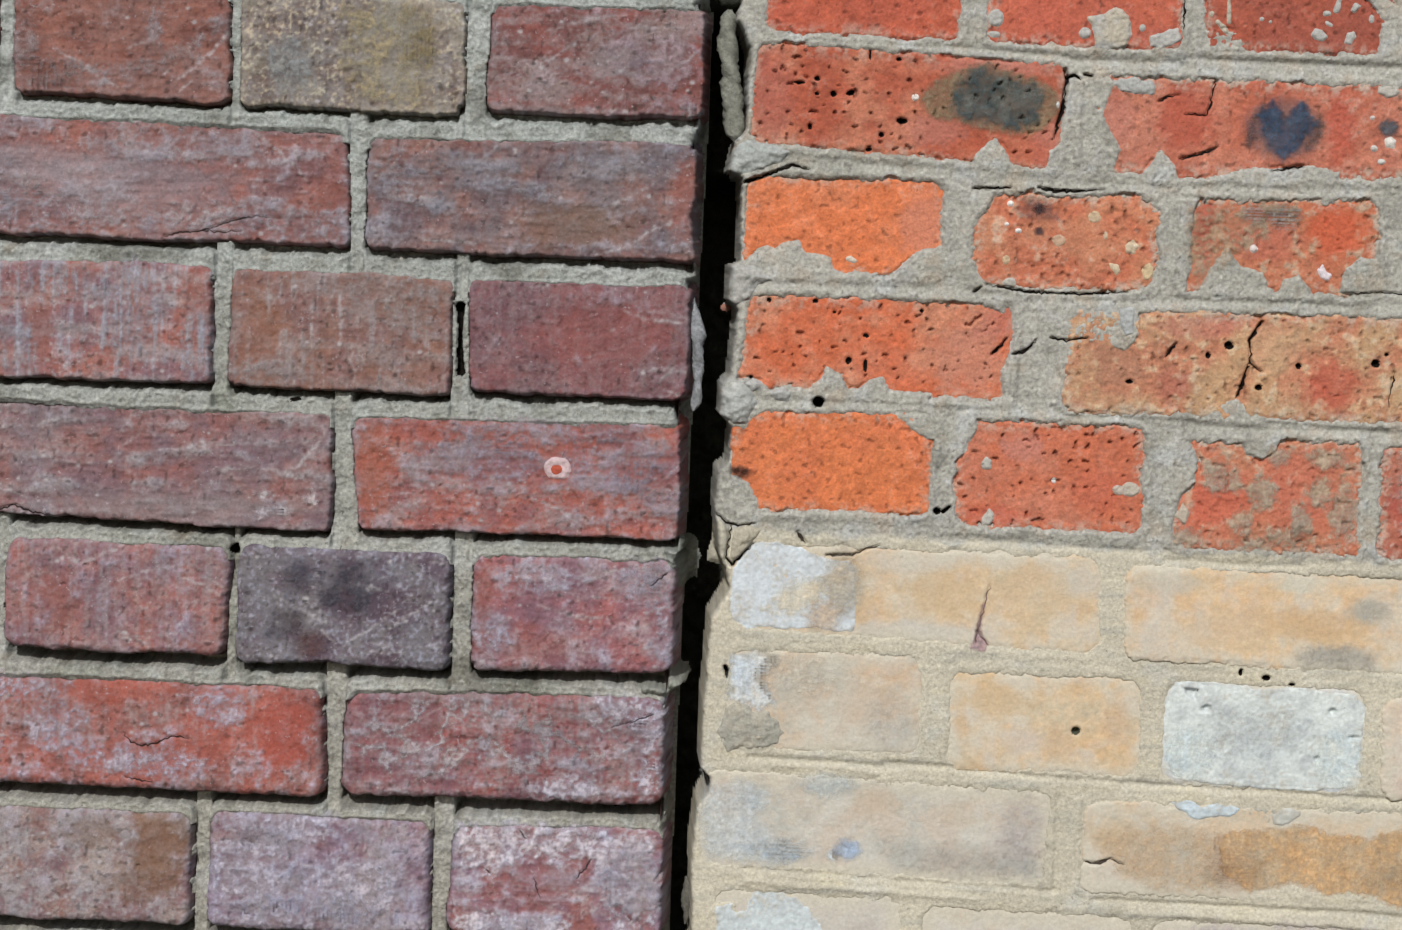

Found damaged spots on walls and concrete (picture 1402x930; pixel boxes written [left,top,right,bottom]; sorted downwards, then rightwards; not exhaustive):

crack [1054,71,1092,139]
crack [1236,322,1261,396]
peeling [729,541,860,632]
crack [124,732,185,782]
peeling [1163,681,1365,791]
peeling [1106,800,1402,907]
peeling [714,891,822,930]